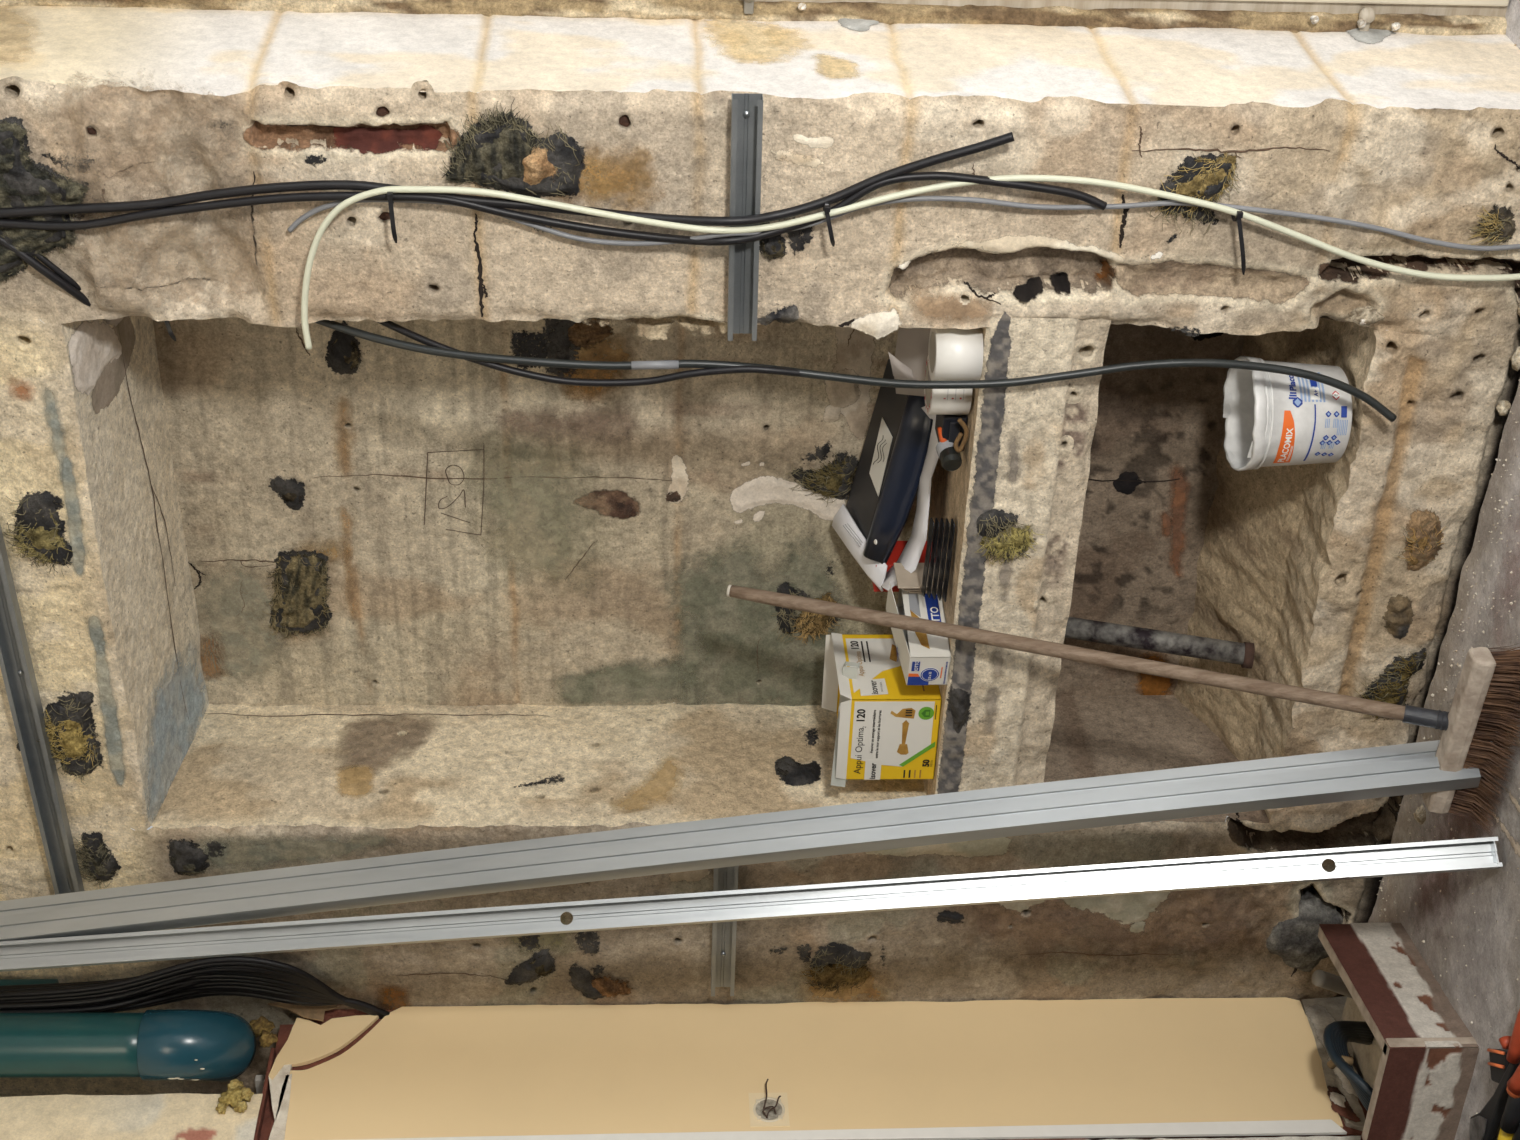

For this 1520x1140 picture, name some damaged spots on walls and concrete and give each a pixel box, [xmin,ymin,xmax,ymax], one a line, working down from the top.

crack [473,213,488,317]
spalling [823,234,1520,440]
peeling [1000,891,1171,933]